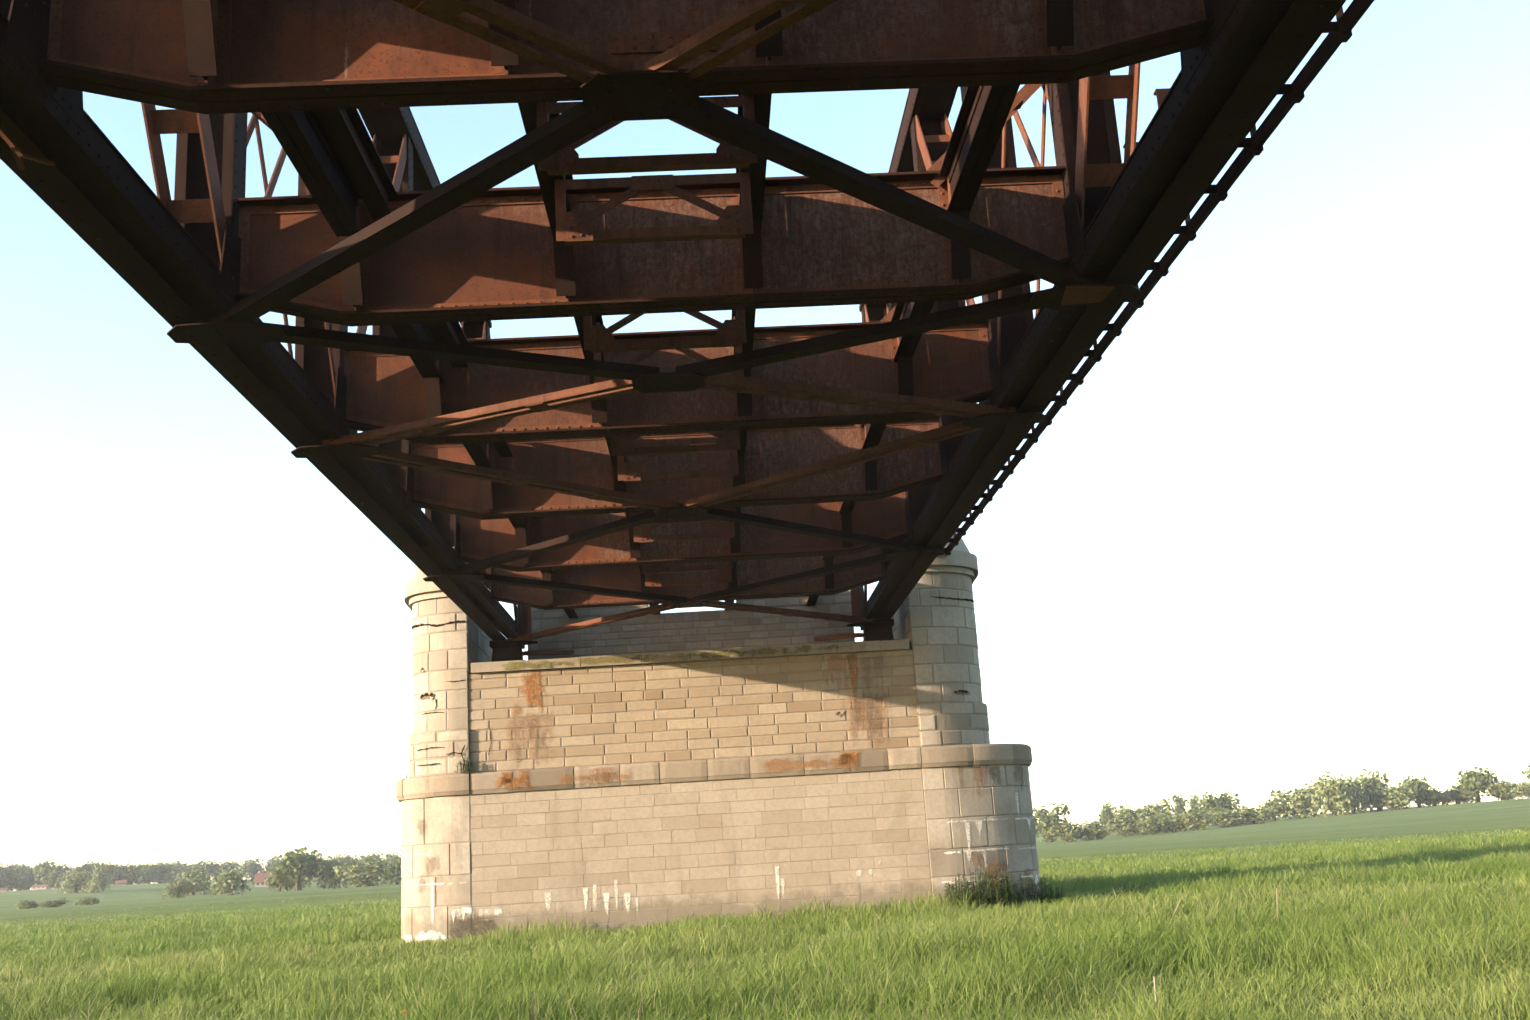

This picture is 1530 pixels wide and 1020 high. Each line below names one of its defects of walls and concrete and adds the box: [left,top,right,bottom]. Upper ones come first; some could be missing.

crack [412,620,466,629]